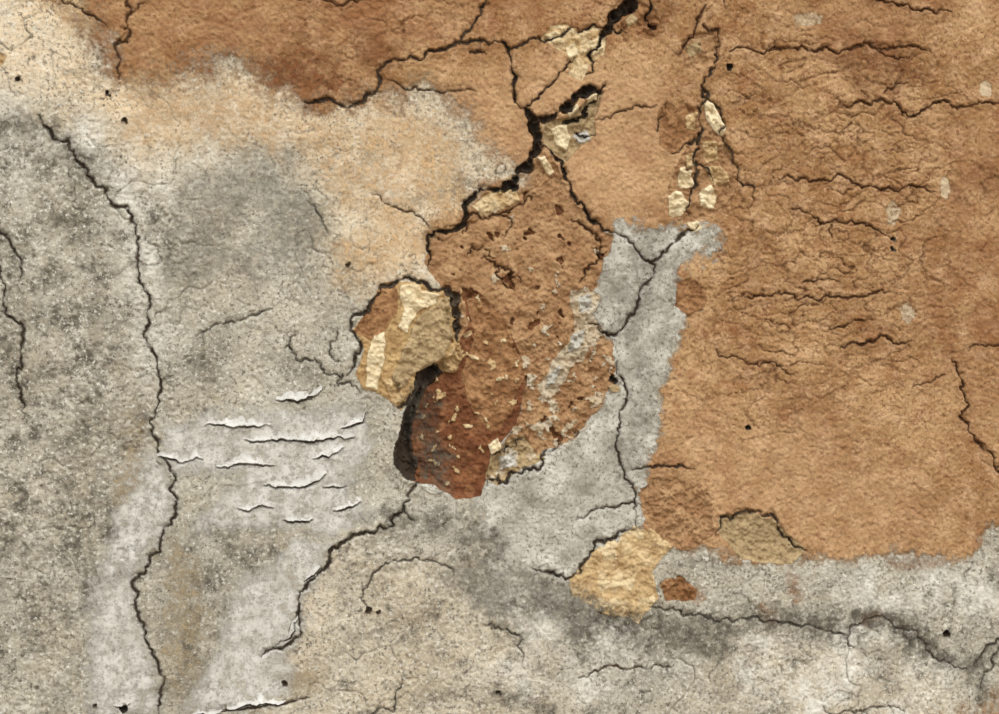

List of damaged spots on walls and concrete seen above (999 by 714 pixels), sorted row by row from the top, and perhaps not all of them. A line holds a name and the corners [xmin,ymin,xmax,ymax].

crack [285,0,997,391]
spalling [657,100,740,232]
crack [0,232,26,414]
crack [39,115,178,706]
peeling [157,449,203,464]
peeling [203,409,367,512]
peeling [276,386,322,403]
crack [261,477,420,657]
spalling [353,92,616,499]
crack [487,435,559,485]
crack [533,362,686,580]
spalling [568,478,806,624]